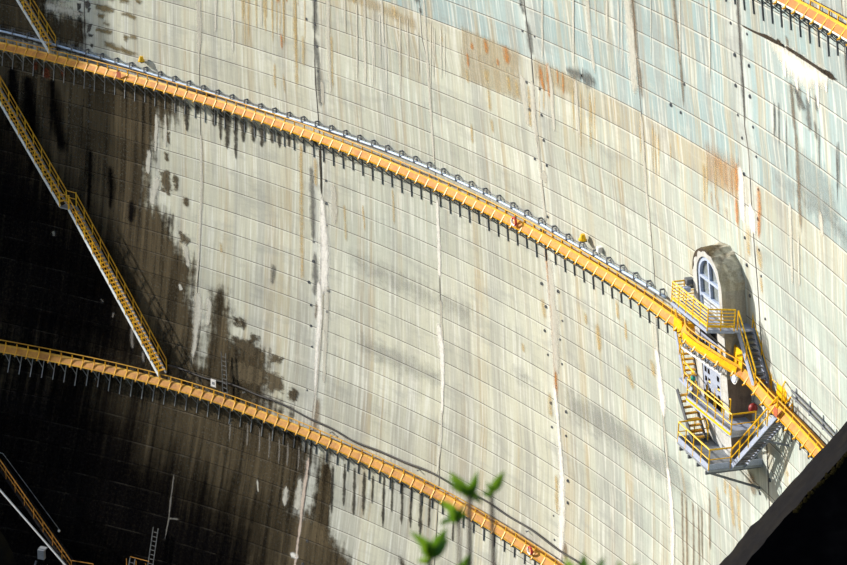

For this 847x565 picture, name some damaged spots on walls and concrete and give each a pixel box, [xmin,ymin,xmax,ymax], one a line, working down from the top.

crack [742,25,836,80]
water stain [0,0,431,565]
water stain [436,301,444,477]
water stain [553,386,565,562]